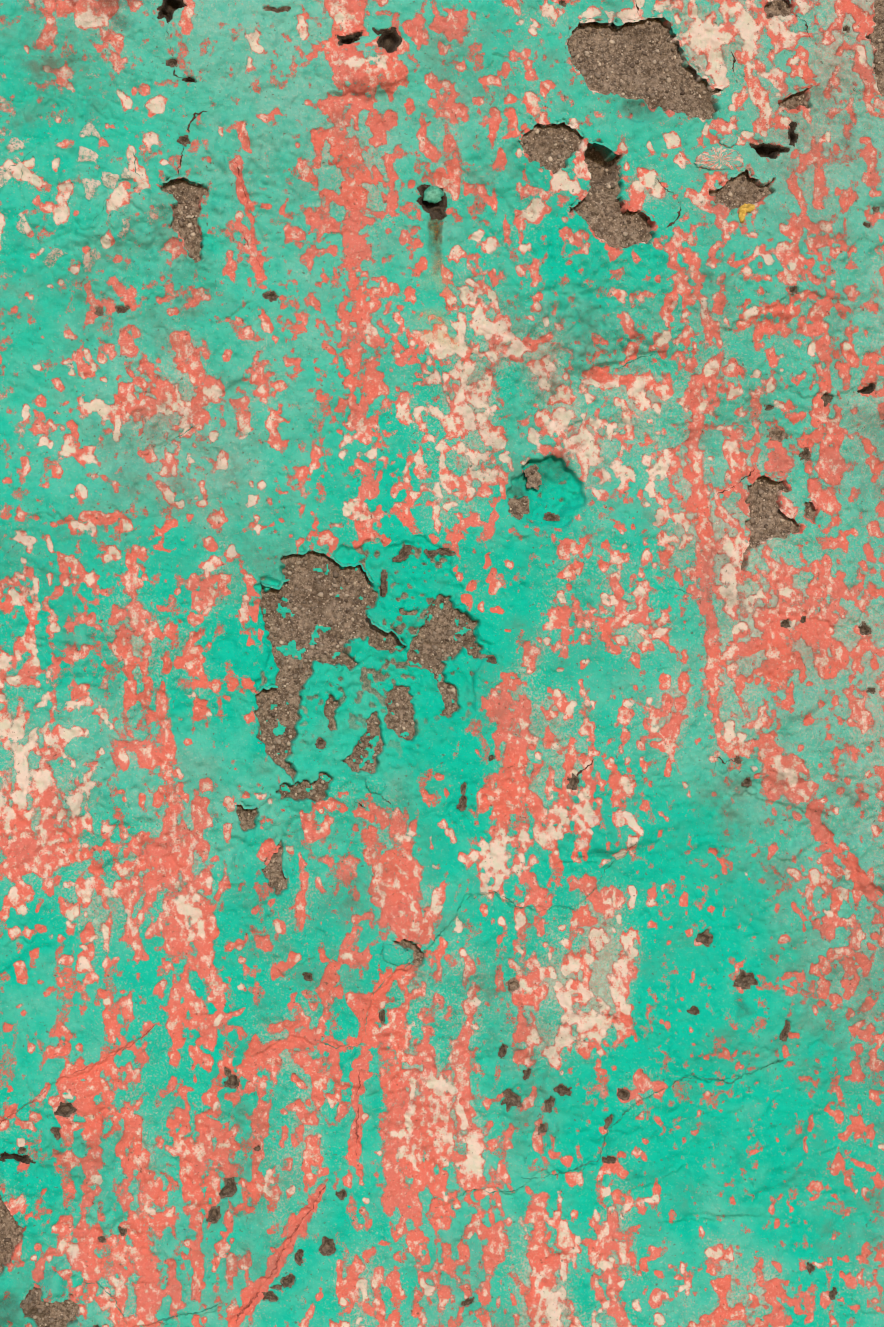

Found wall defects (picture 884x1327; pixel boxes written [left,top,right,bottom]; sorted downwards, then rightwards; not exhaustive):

spalling [565,6,746,120]
peeling [695,0,884,210]
spalling [519,120,654,250]
spalling [508,464,560,521]
peeling [686,340,876,738]
spalling [254,545,551,811]
peeling [343,685,423,915]
crack [317,841,639,1155]
crack [0,1026,154,1124]
crack [436,1058,786,1208]
peeling [19,1195,194,1327]
crack [84,1185,326,1327]